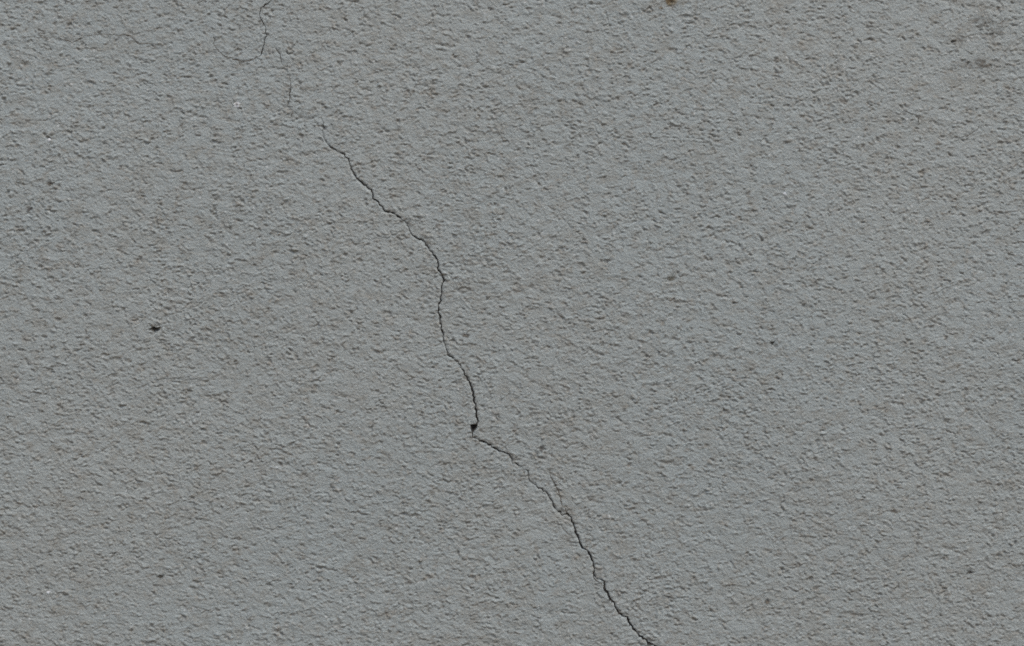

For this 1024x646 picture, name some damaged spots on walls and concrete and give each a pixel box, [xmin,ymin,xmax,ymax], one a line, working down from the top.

crack [213,0,655,646]